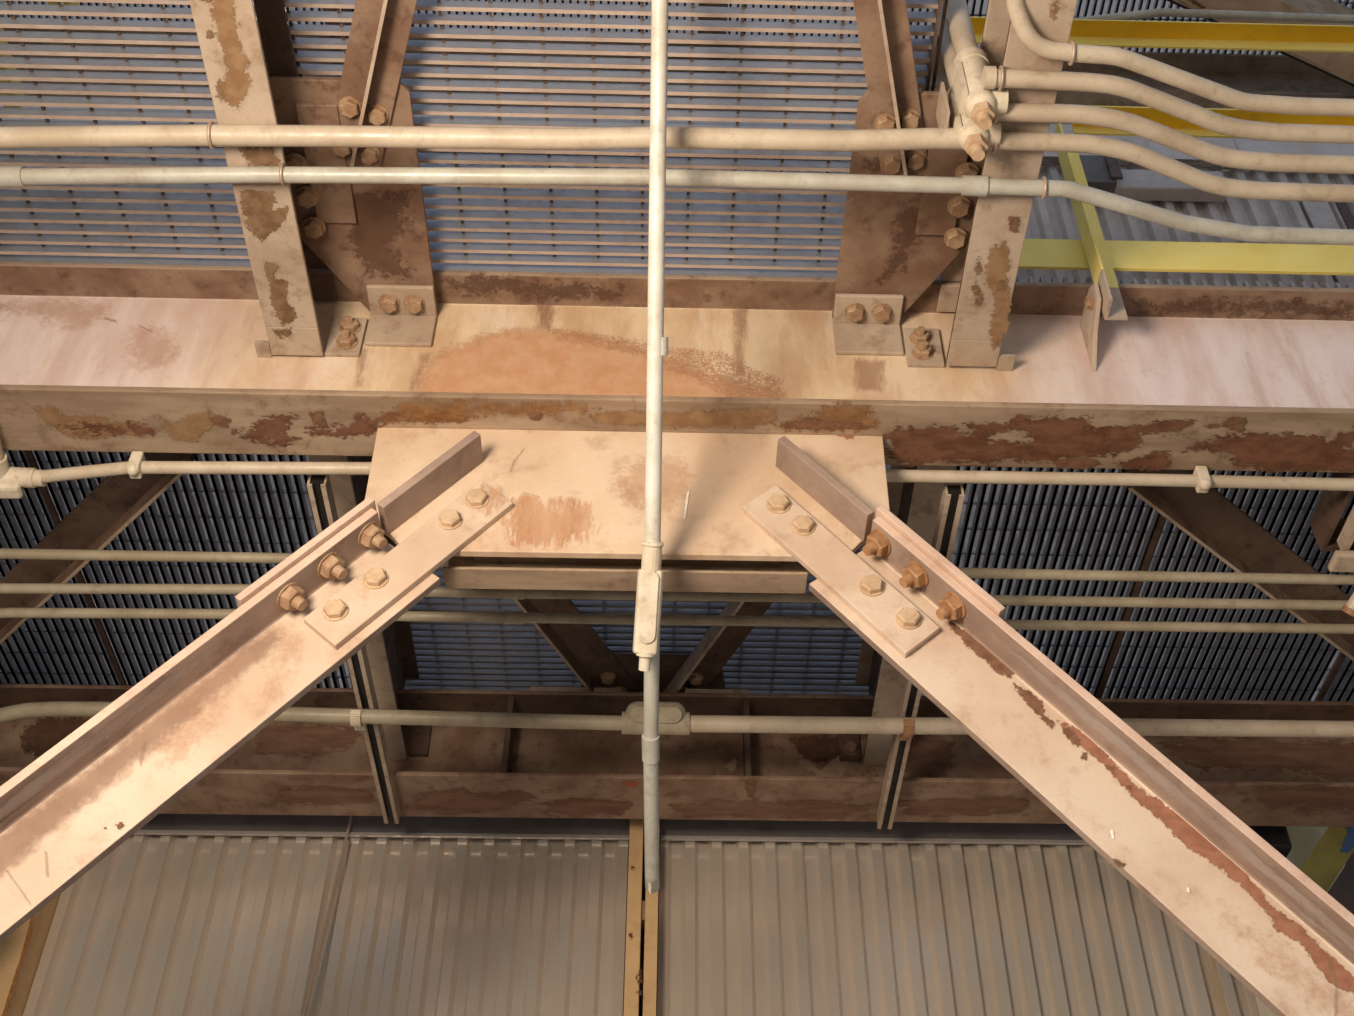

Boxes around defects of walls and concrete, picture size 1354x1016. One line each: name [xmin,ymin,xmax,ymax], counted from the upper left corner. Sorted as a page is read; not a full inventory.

corrosion [384,328,647,424]
corrosion [663,347,785,398]
peeling [668,799,870,820]
peeling [897,796,1030,818]
peeling [948,622,1354,994]